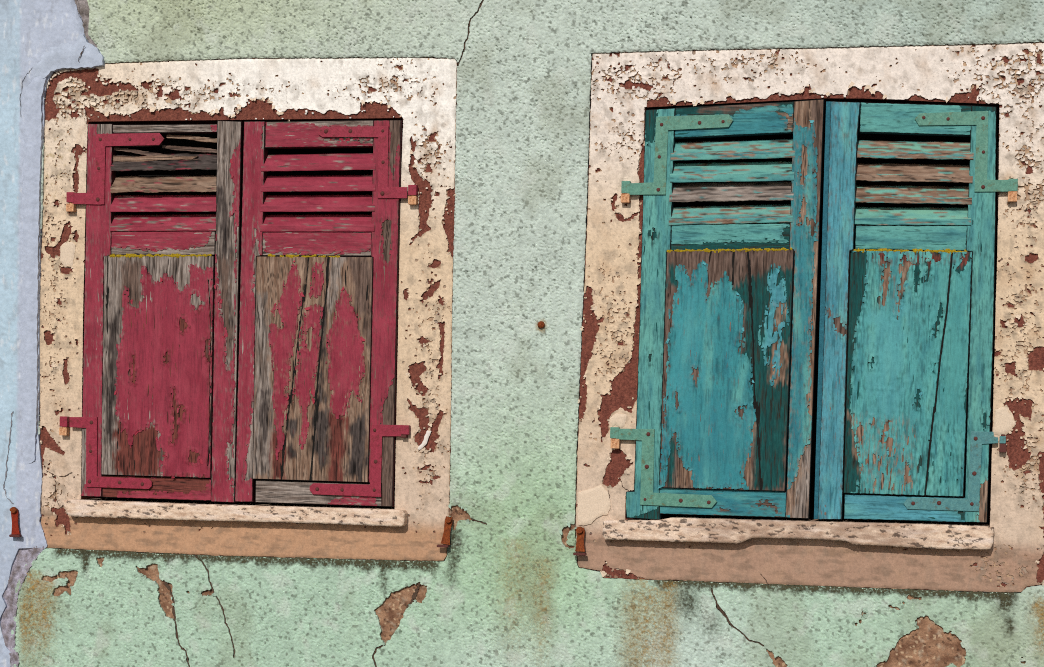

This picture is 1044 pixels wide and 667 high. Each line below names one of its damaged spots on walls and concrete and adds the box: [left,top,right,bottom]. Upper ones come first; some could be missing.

crack [458,0,484,66]
peeling [45,68,403,124]
peeling [606,65,889,107]
peeling [403,136,456,306]
peeling [559,141,645,549]
peeling [406,321,446,485]
peeling [993,392,1044,538]
crack [164,580,190,667]
crack [195,555,235,657]
crack [406,583,421,608]
crack [711,588,764,646]
spalling [872,614,966,667]